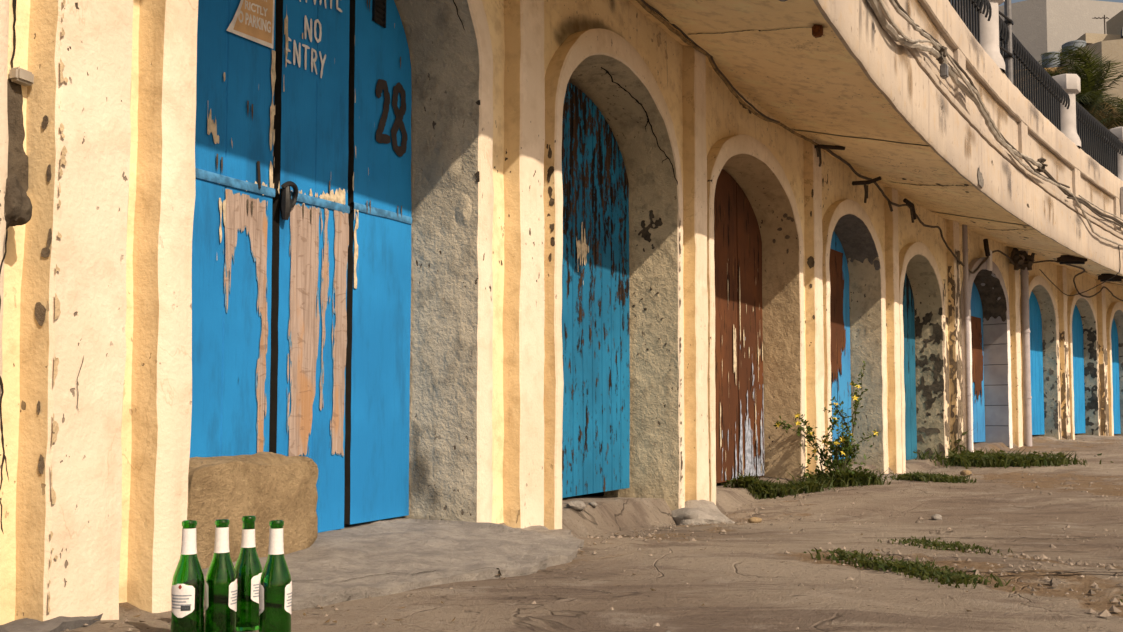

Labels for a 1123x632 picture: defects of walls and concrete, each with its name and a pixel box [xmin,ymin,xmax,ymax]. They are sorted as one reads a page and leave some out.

crack [601,67,678,185]
peeling [576,222,589,266]
peeling [915,250,964,457]
spalling [974,269,1007,322]
peeling [1042,331,1071,440]
peeling [1081,316,1123,436]